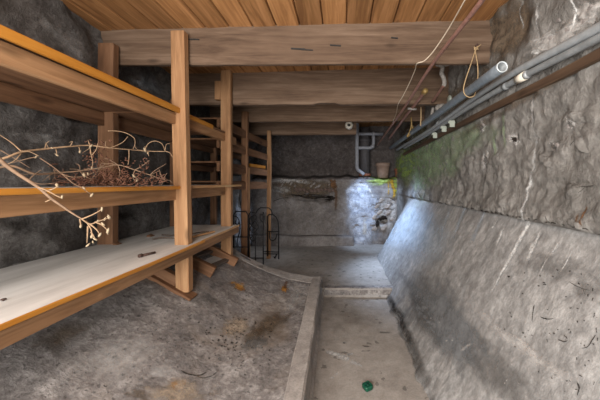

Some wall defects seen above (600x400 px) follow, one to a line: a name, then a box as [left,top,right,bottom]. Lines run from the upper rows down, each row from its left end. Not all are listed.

water stain [448,77,489,109]
water stain [399,122,428,147]
water stain [243,314,288,349]